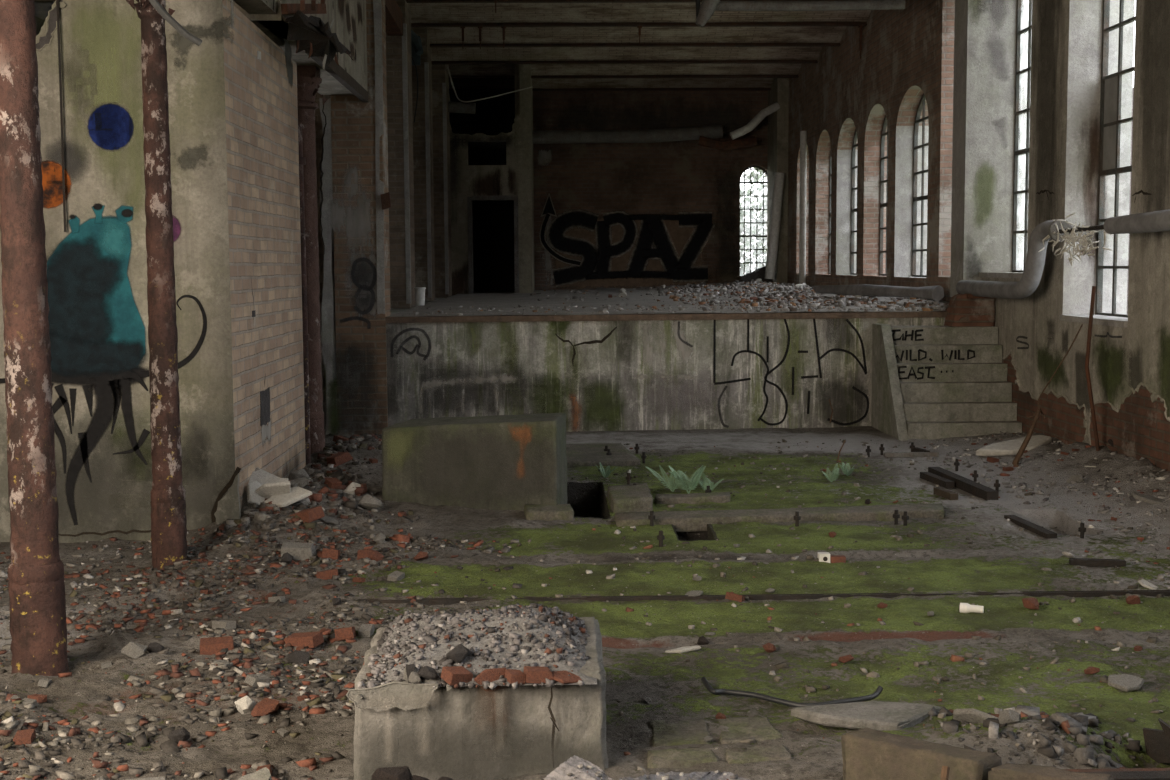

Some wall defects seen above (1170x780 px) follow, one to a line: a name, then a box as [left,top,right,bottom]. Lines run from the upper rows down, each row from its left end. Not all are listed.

spalling [36,0,67,51]
spalling [1002,348,1170,471]